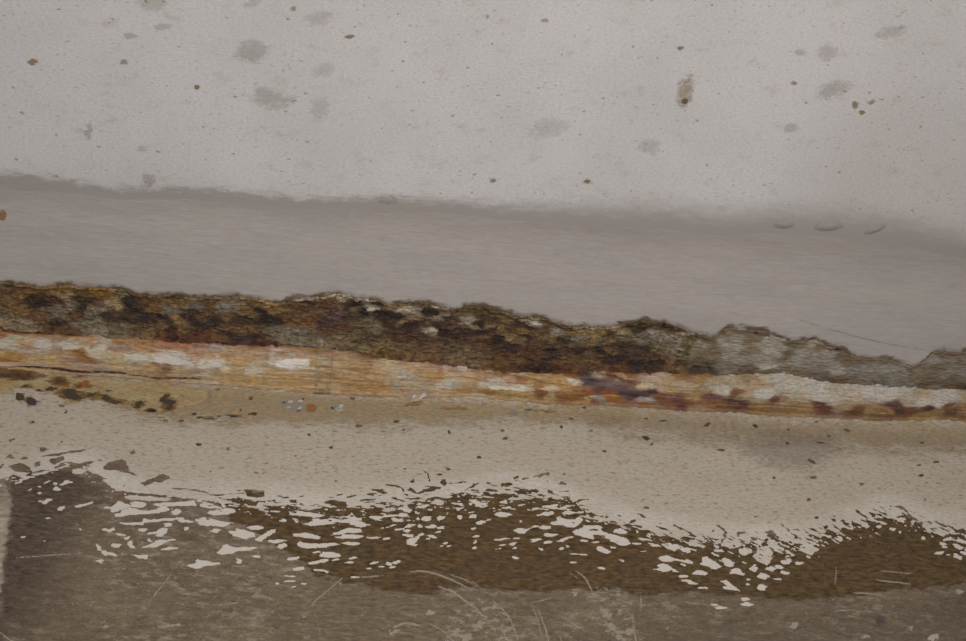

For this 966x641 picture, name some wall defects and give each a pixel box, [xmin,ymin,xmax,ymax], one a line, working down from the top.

corrosion [0,327,966,445]
damp [211,468,966,601]